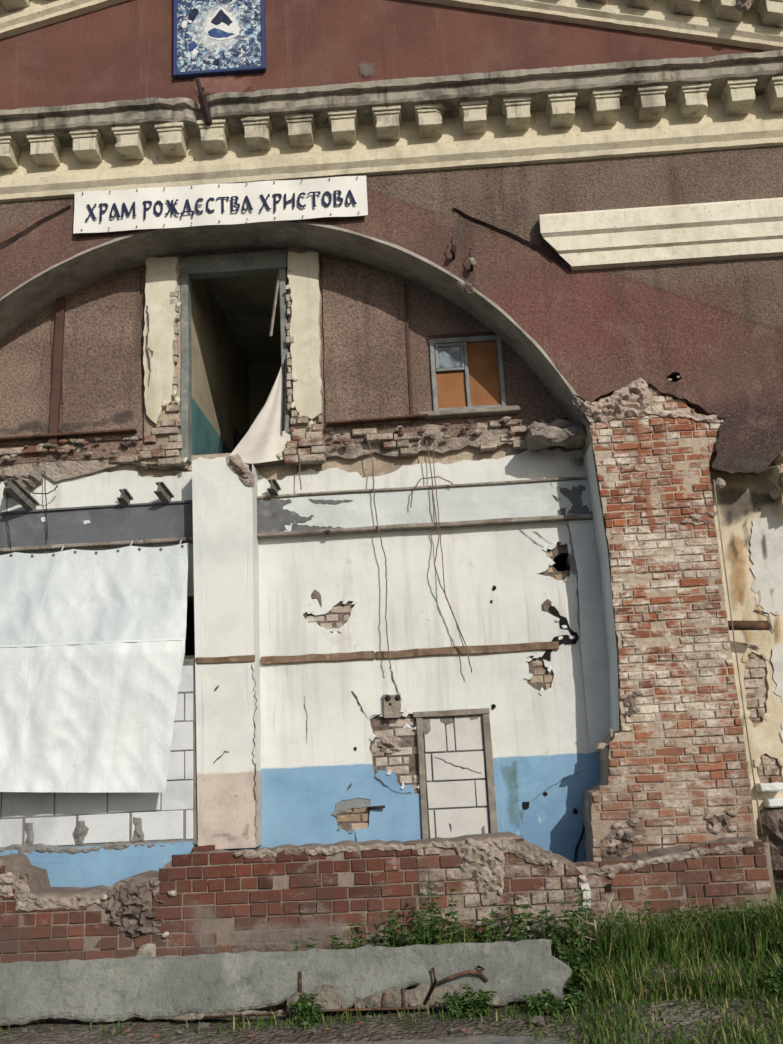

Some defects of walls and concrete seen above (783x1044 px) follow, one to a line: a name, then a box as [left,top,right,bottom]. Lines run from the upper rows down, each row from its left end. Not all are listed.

spalling [139,258,187,468]
spalling [277,260,327,466]
spalling [226,454,255,487]
peeling [257,498,353,533]
hole [540,540,570,581]
peeling [749,511,783,616]
spalling [303,589,357,633]
spalling [525,652,554,695]
spalling [741,645,783,741]
spalling [369,709,420,793]
spalling [332,798,385,833]
spalling [0,872,177,942]